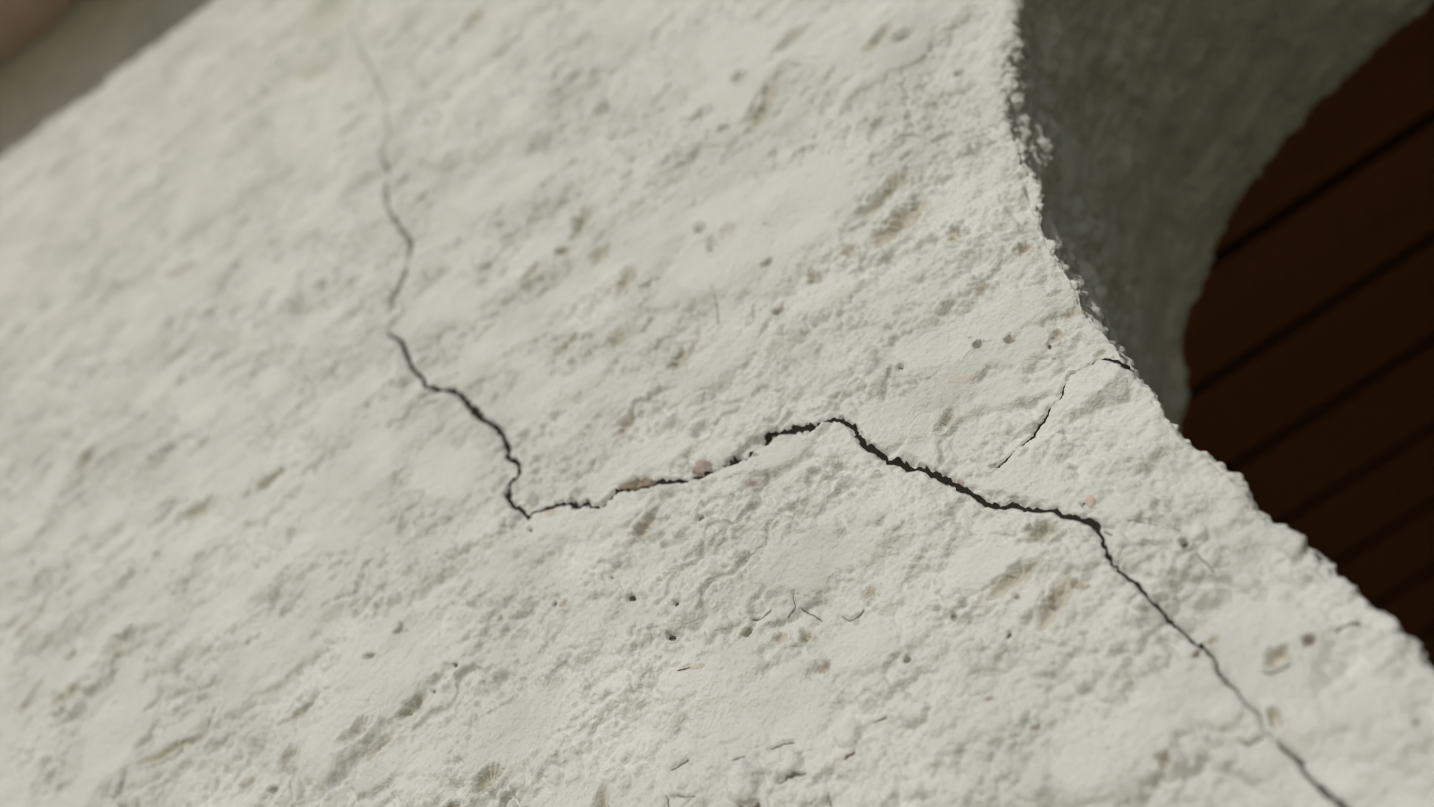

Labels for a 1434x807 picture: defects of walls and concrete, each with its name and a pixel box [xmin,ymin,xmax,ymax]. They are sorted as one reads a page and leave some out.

crack [382,154,1346,807]
crack [1334,621,1361,633]